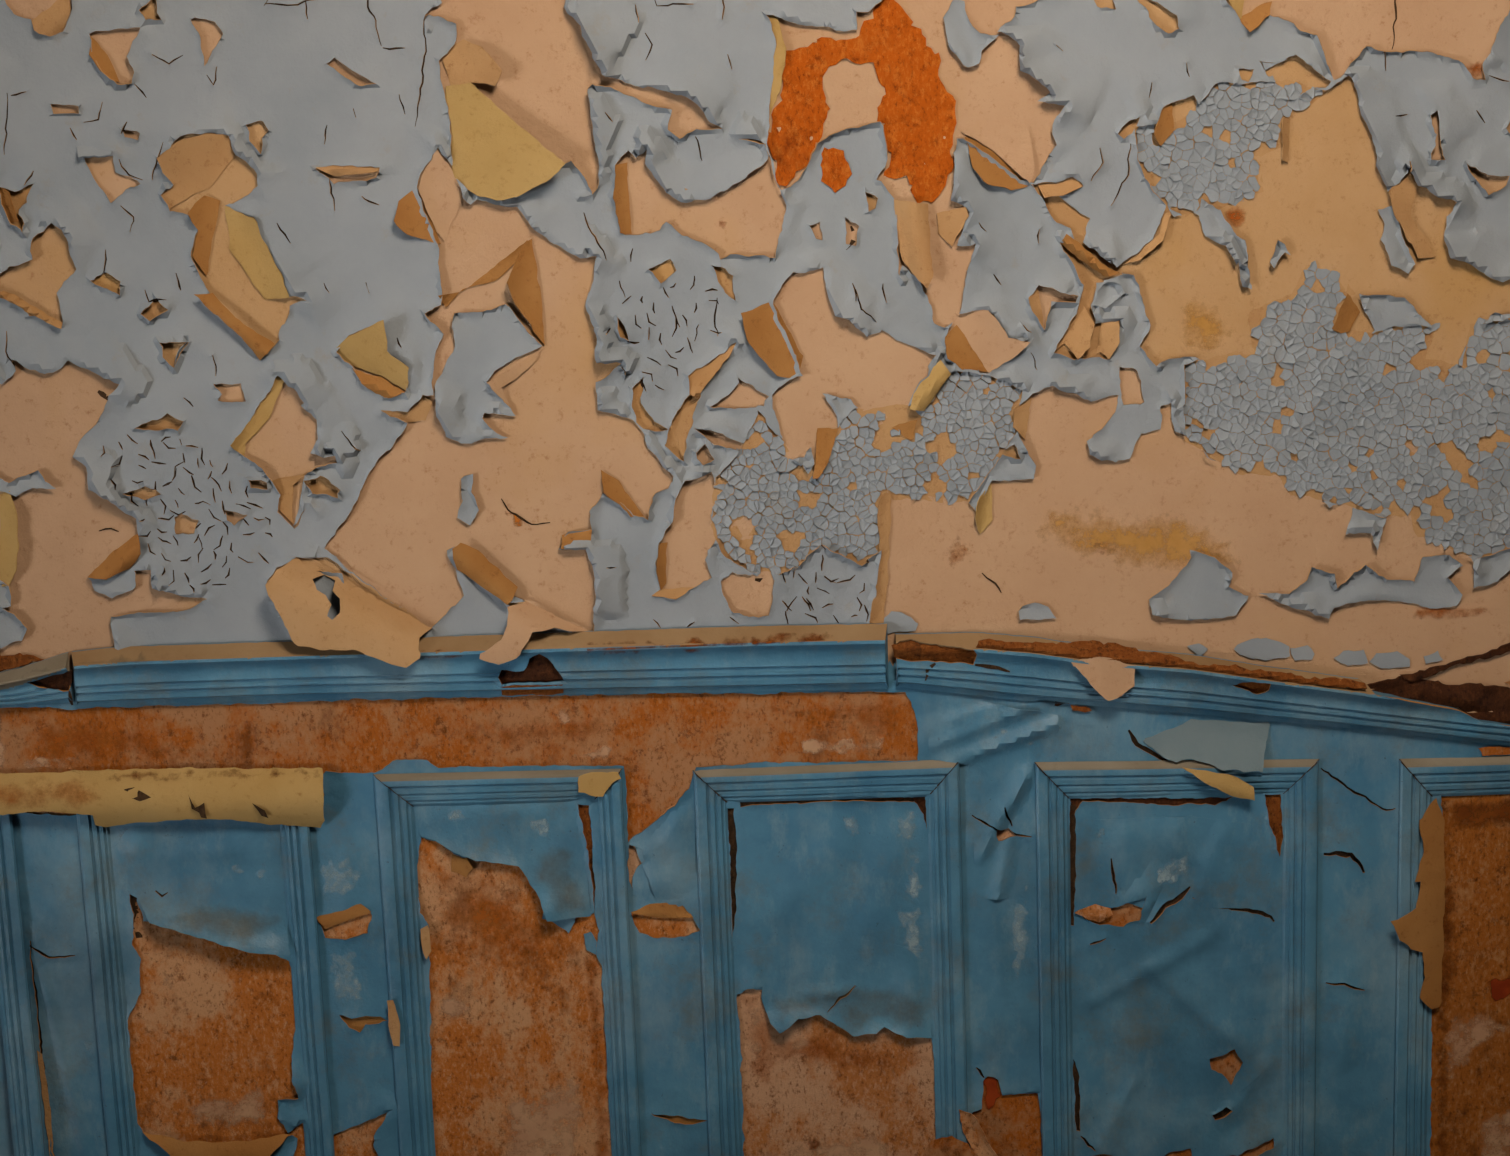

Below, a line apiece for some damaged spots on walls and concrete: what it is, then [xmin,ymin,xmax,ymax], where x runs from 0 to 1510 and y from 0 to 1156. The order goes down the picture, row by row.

crack [97,390,108,400]
crack [99,398,273,591]
peeling [0,0,927,1156]
crack [584,213,722,391]
crack [710,327,1036,624]
peeling [613,0,1510,479]
peeling [869,367,1510,701]
crack [1091,63,1324,217]
crack [1183,261,1510,559]
peeling [737,989,1042,1156]
peeling [1210,1049,1243,1084]
peeling [1391,794,1510,1156]